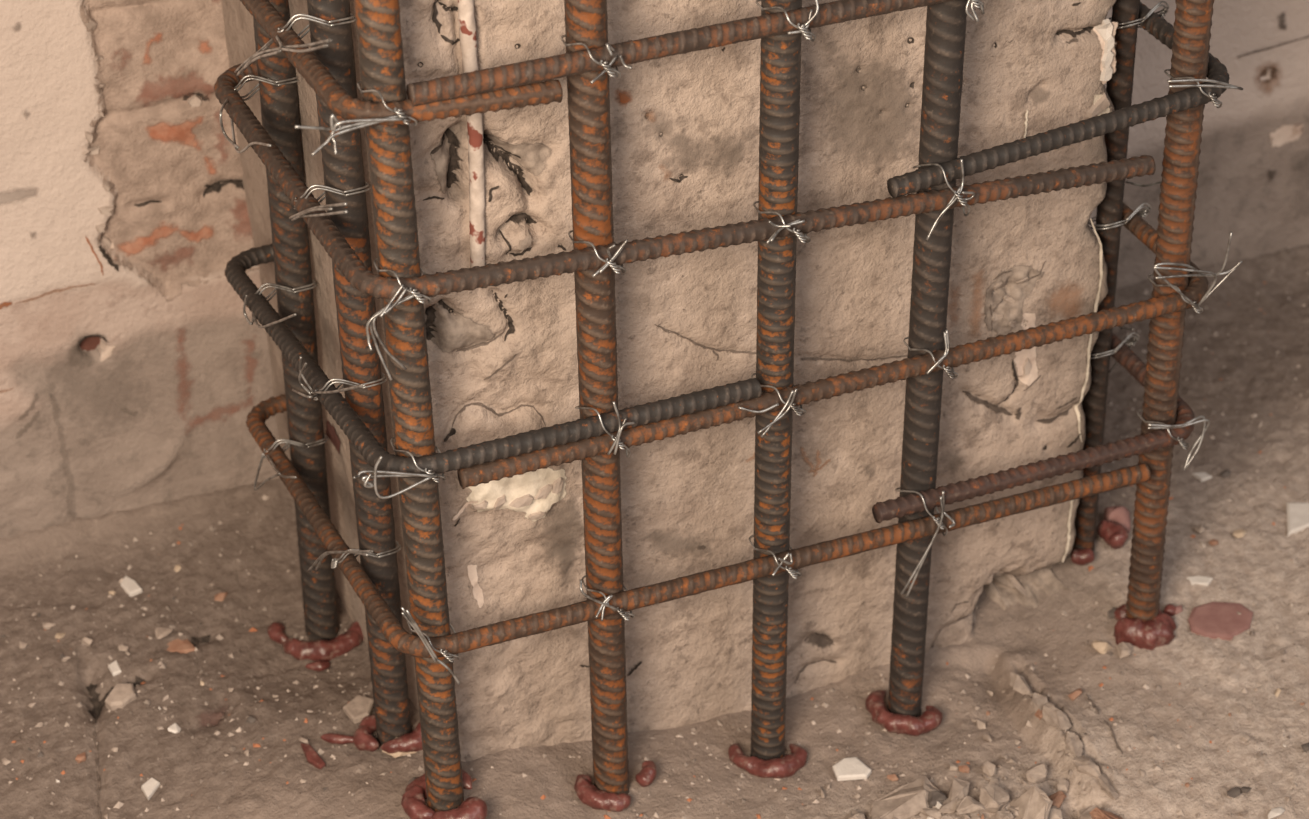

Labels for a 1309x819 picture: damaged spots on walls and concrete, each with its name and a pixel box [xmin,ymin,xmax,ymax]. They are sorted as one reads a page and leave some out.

flaking render [80,0,255,302]
spalling [316,94,462,279]
crack [432,0,460,45]
spalling [558,69,614,251]
spalling [758,33,801,220]
spalling [905,0,968,169]
spalling [1056,0,1140,118]
crack [492,290,515,341]
spalling [574,267,618,419]
spalling [907,208,954,358]
spalling [466,449,624,600]
spalling [888,535,933,717]